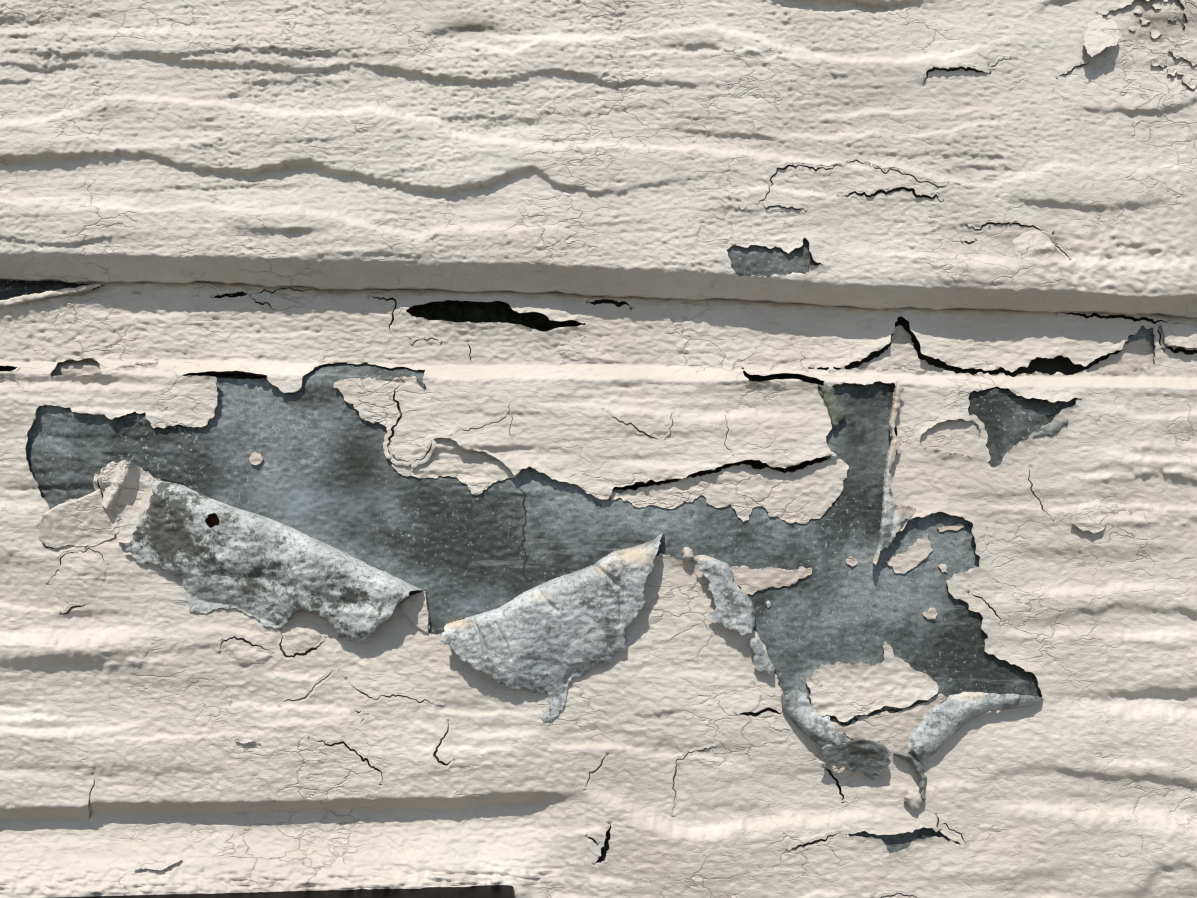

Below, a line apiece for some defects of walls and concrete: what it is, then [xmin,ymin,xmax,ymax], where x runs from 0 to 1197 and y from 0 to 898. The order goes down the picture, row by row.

peeling [1056,0,1197,89]
crack [739,156,960,214]
peeling [727,238,821,277]
crack [962,218,1072,260]
peeling [0,279,104,308]
peeling [26,316,1197,810]
crack [586,823,615,866]
crack [787,764,847,855]
peeling [846,827,962,853]
crack [933,814,970,848]